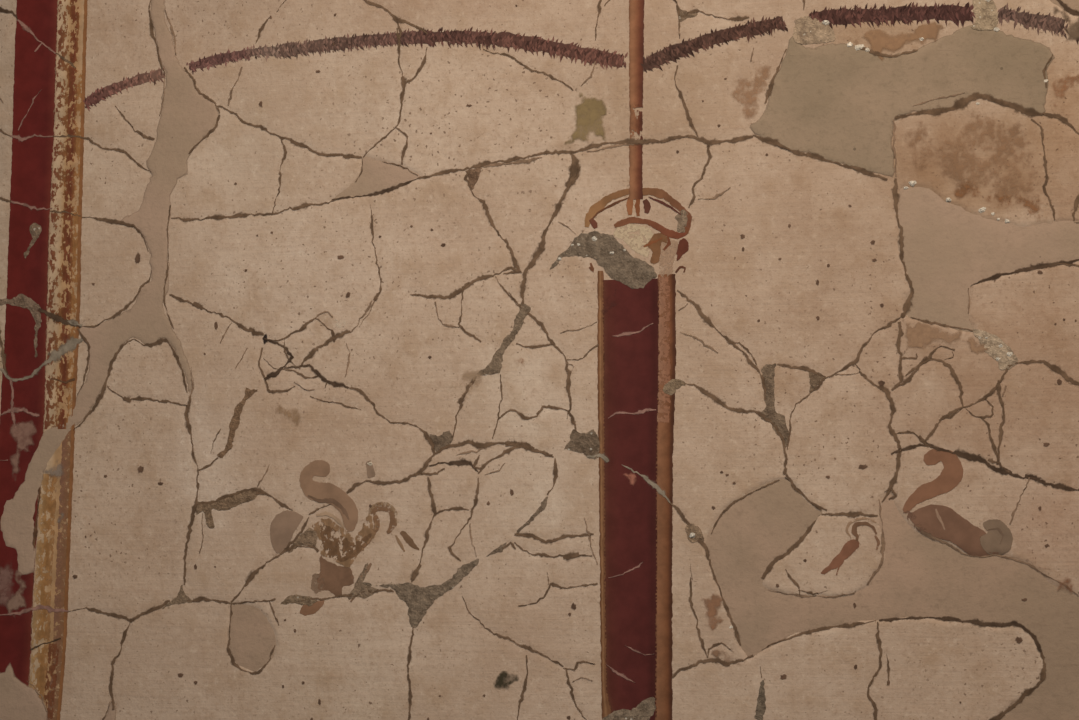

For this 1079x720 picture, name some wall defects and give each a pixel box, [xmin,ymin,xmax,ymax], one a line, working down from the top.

peeling [0,0,71,429]
crack [0,274,151,428]
flaking render [550,231,657,289]
crack [163,0,1079,607]
peeling [29,474,58,700]
crack [73,338,293,585]
crack [187,504,330,674]
crack [462,596,654,720]
flaking render [602,697,656,720]
flaking render [685,524,704,543]
flaking render [755,680,766,720]
crack [672,537,1046,720]